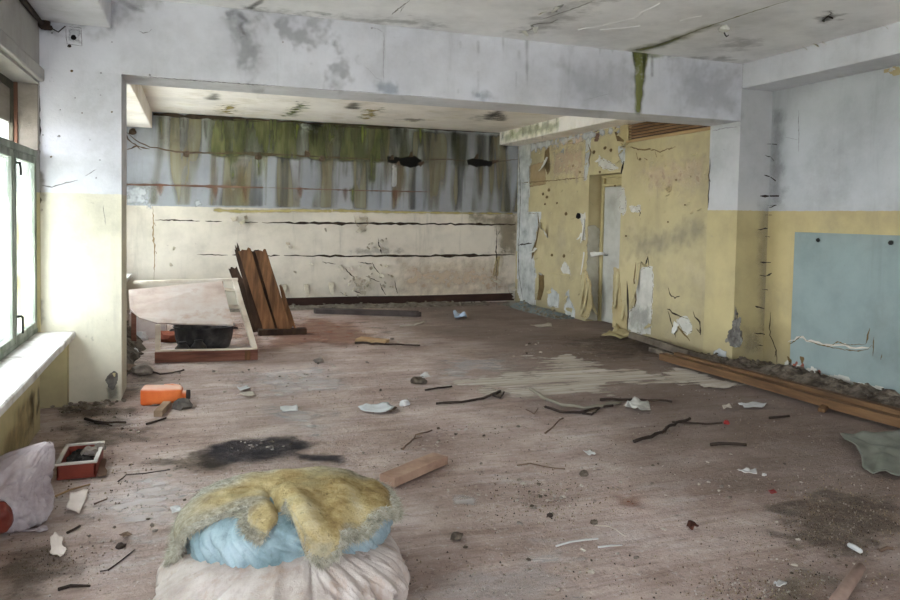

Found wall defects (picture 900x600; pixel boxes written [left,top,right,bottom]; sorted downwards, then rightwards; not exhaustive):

leakage [127,187,155,203]
leakage [159,117,518,253]
peeling [572,124,629,181]
crack [758,116,799,237]
crack [245,221,515,288]
peeling [491,144,604,321]
peeling [612,257,654,335]
peeling [668,309,693,341]
spalling [725,308,743,348]
crack [755,262,777,357]
peeling [788,328,882,358]